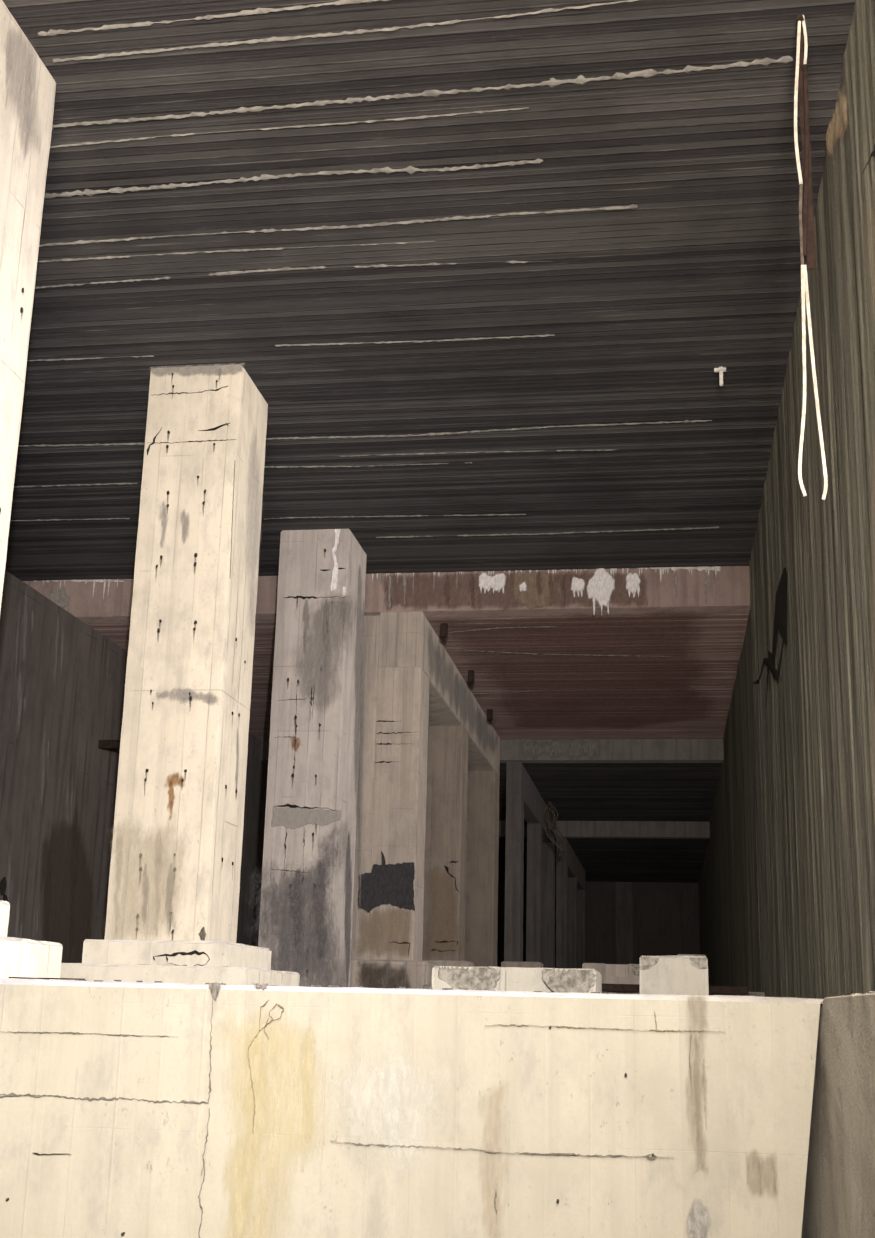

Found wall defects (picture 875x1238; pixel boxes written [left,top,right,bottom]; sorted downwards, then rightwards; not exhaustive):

water stain [452,526,719,536]
water stain [456,566,721,615]
water stain [249,449,616,989]
rust [168,773,184,813]
peeling [358,851,415,911]
crack [9,974,85,982]
crack [153,950,210,966]
spalling [425,965,501,991]
spalling [534,968,617,994]
spalling [632,956,660,976]
crack [248,1001,284,1126]
crack [0,999,213,1237]